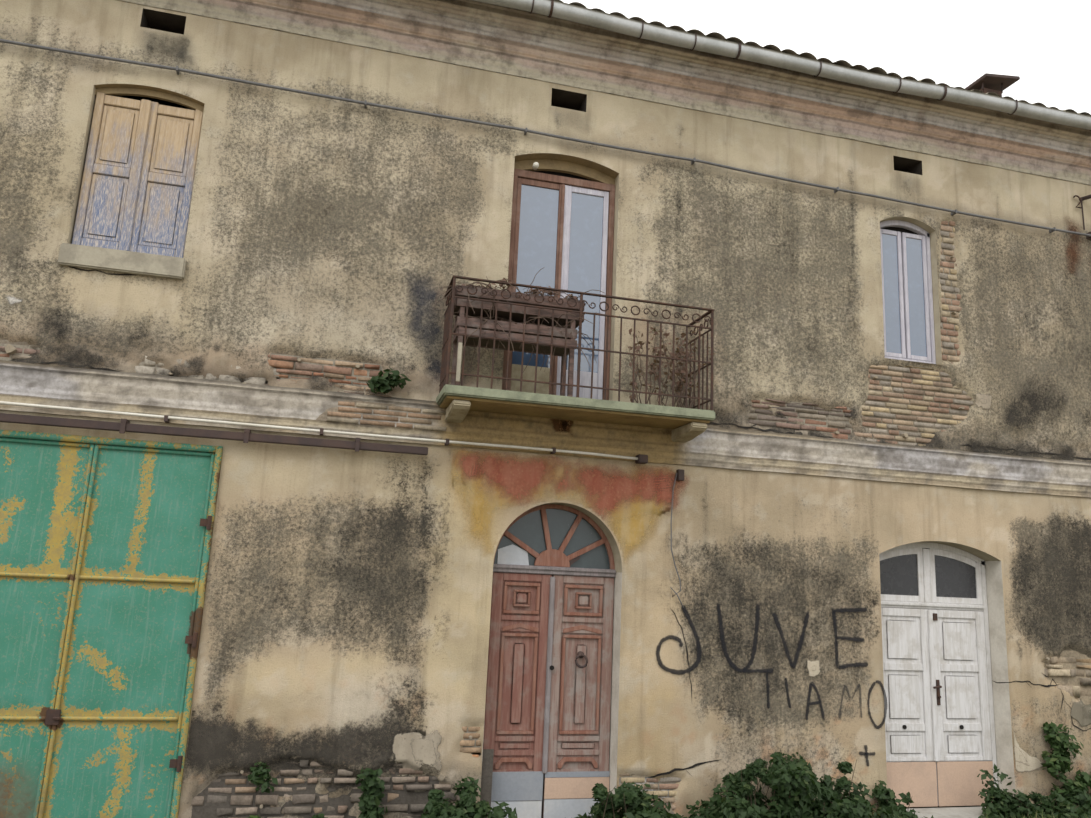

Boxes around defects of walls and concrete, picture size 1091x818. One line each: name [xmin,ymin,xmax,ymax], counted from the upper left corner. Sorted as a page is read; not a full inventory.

flaking render [736,221,992,446]
flaking render [135,353,446,431]
damp [969,438,1075,460]
peeling [454,450,682,546]
damp [324,467,446,665]
damp [675,534,878,715]
damp [1012,517,1091,656]
damp [186,679,424,793]
crack [993,673,1091,731]
flaking render [1042,649,1091,726]
flaking render [191,759,363,818]
flaking render [378,763,460,818]